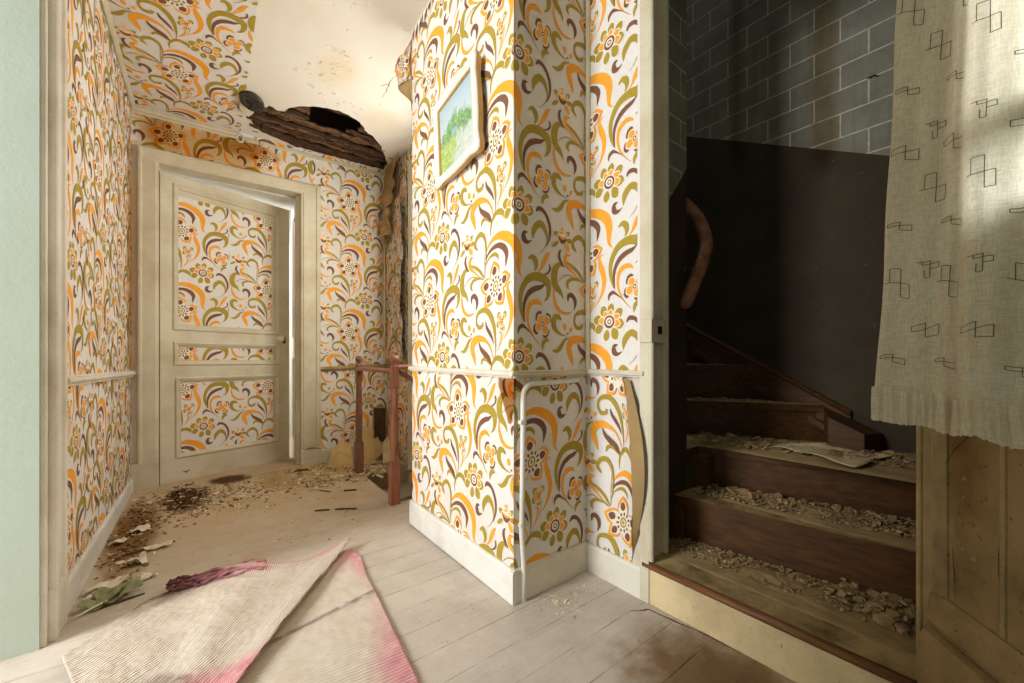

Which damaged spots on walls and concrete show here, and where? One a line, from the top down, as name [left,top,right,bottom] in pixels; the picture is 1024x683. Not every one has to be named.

spalling [264,45,381,149]
flaking render [623,377,640,423]